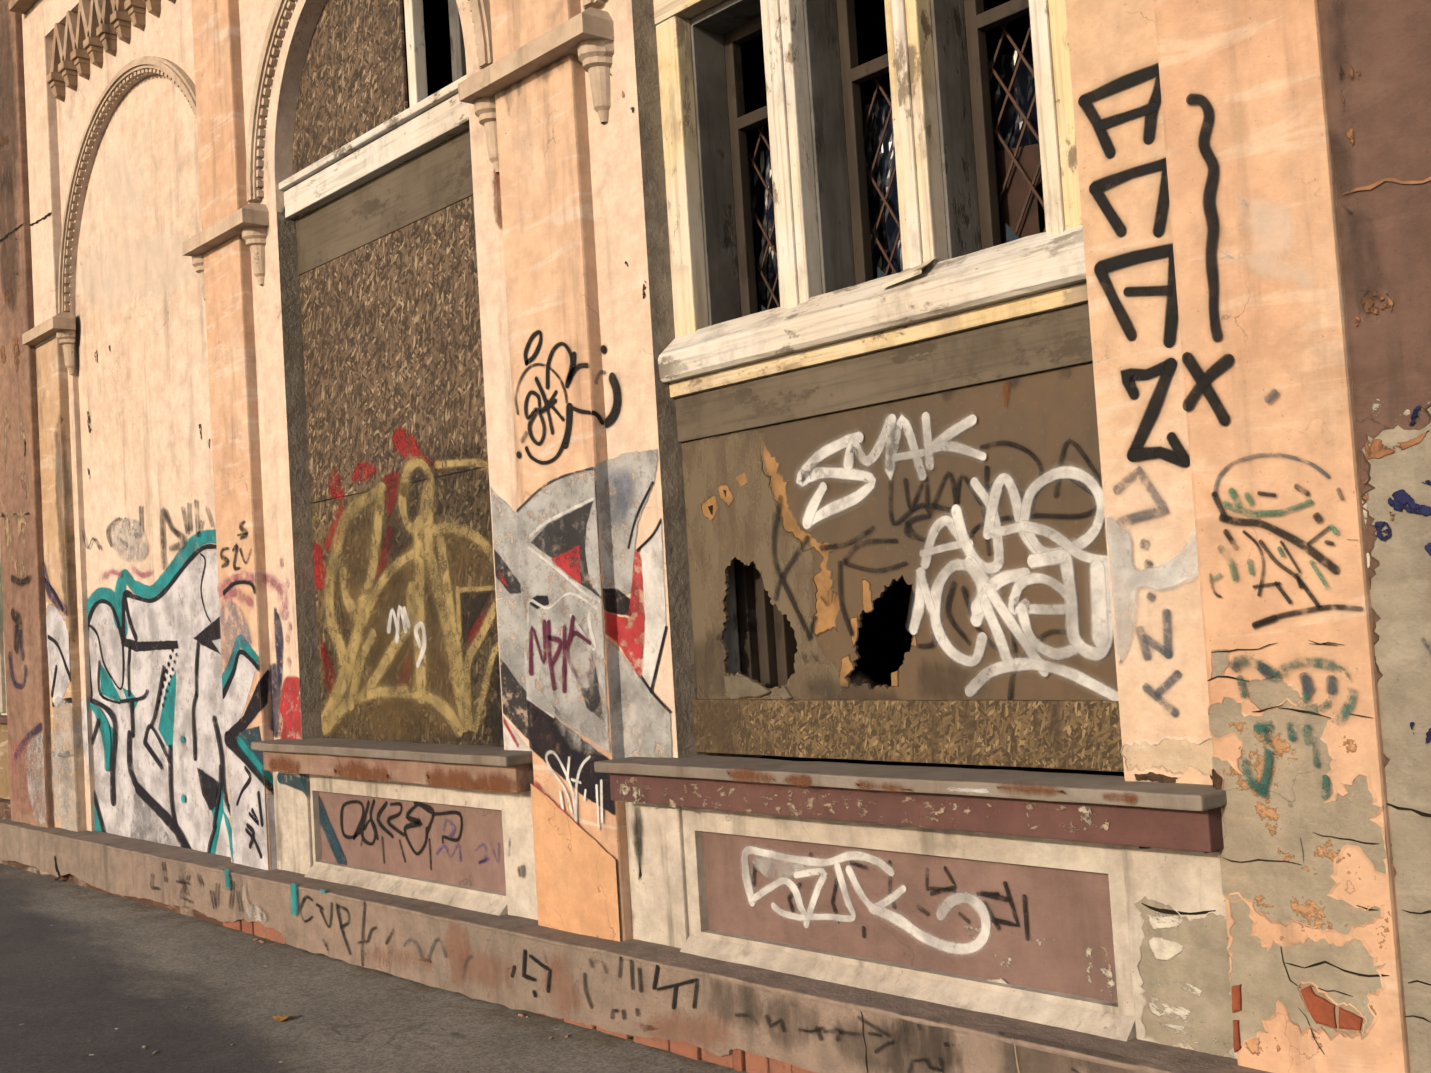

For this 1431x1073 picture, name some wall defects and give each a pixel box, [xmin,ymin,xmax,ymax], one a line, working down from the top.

peeling [681,431,846,699]
peeling [1121,399,1431,1073]
crack [1387,803,1431,817]
crack [1204,832,1379,865]
crack [1356,905,1431,914]
flaking render [538,1013,817,1073]